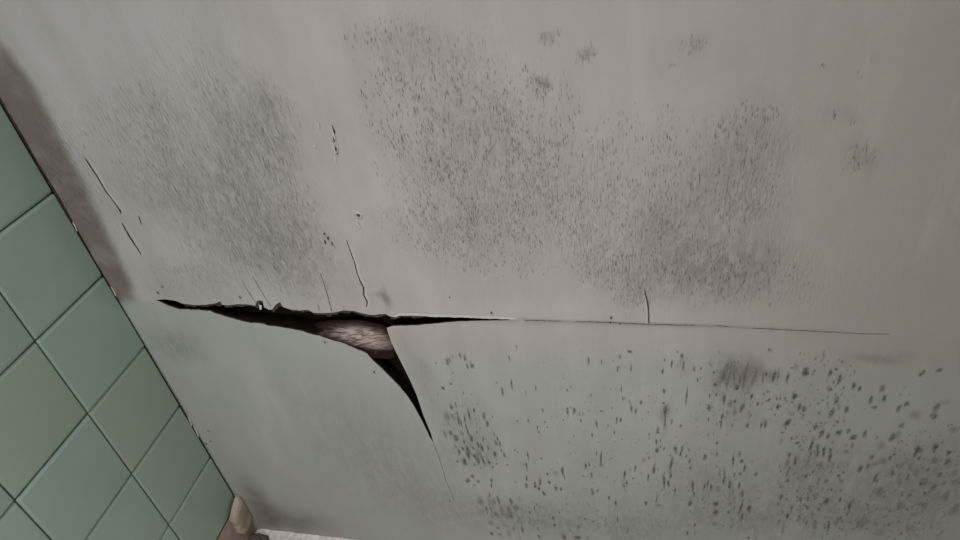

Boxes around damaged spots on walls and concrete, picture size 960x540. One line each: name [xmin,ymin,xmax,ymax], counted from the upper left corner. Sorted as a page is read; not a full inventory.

leakage [0,62,108,249]
crack [0,98,234,494]
crack [161,240,542,500]
crack [577,289,694,326]